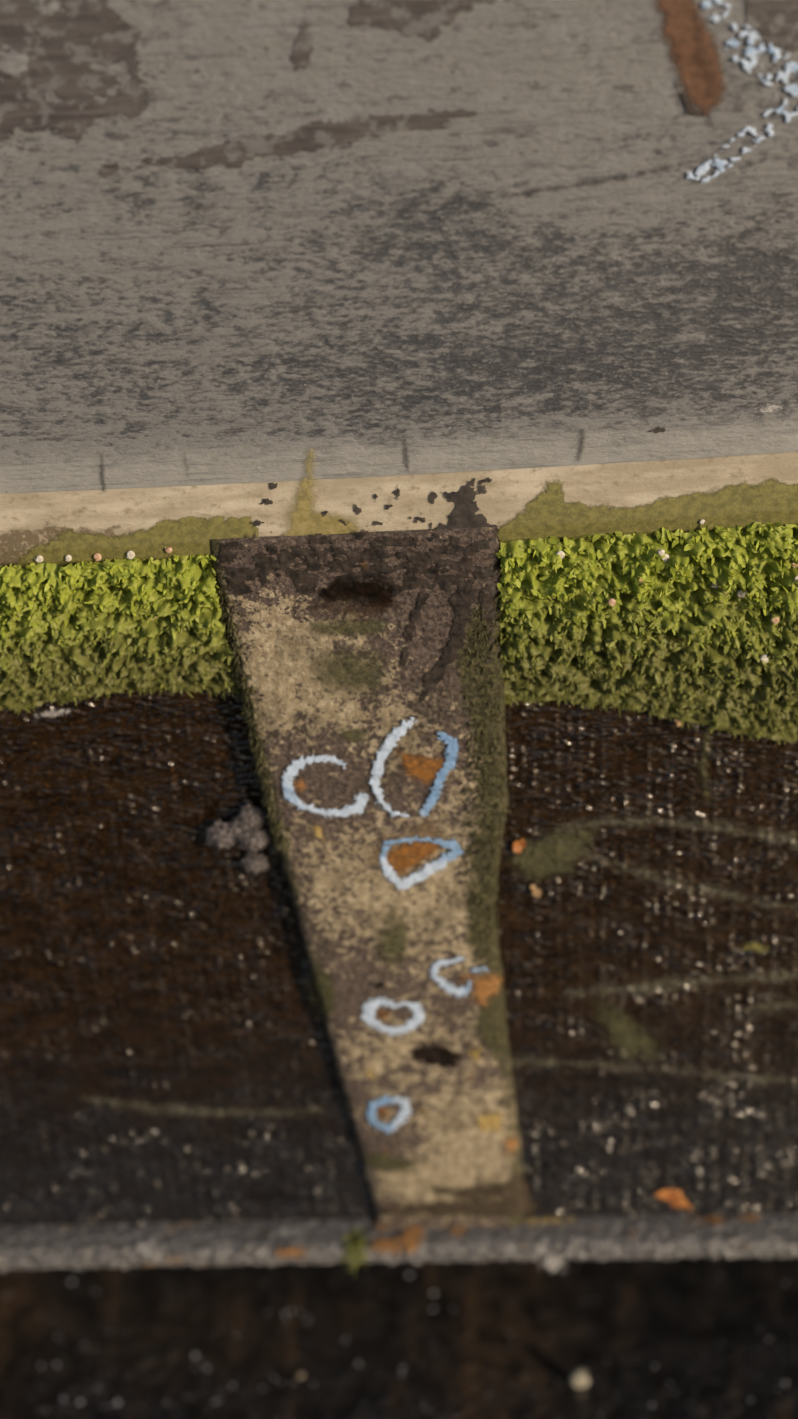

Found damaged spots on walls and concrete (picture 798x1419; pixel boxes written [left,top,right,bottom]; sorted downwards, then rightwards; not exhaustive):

peeling [347,0,497,42]
peeling [0,0,149,148]
rust [658,0,726,116]
peeling [142,109,477,169]
peeling [98,162,119,177]